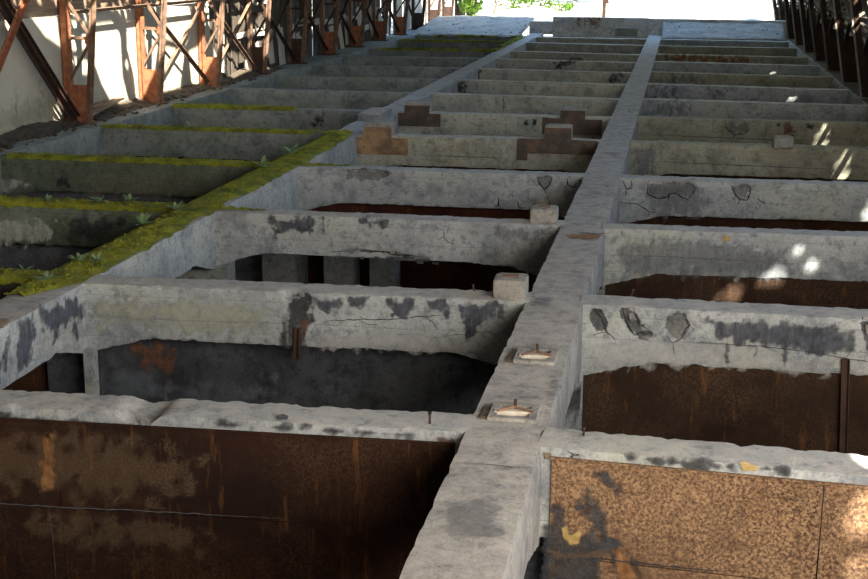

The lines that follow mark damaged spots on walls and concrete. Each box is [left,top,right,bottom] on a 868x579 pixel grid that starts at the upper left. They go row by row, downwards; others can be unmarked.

crack [495,178,576,209]
crack [597,180,696,216]
damp [0,297,83,372]
crack [310,314,488,338]
damp [428,299,503,339]
spalling [590,308,609,331]
spalling [620,307,653,341]
spalling [665,311,691,340]
damp [697,318,855,375]
corrosion [41,435,54,488]
corrosion [594,471,621,497]
corrosion [541,488,640,579]